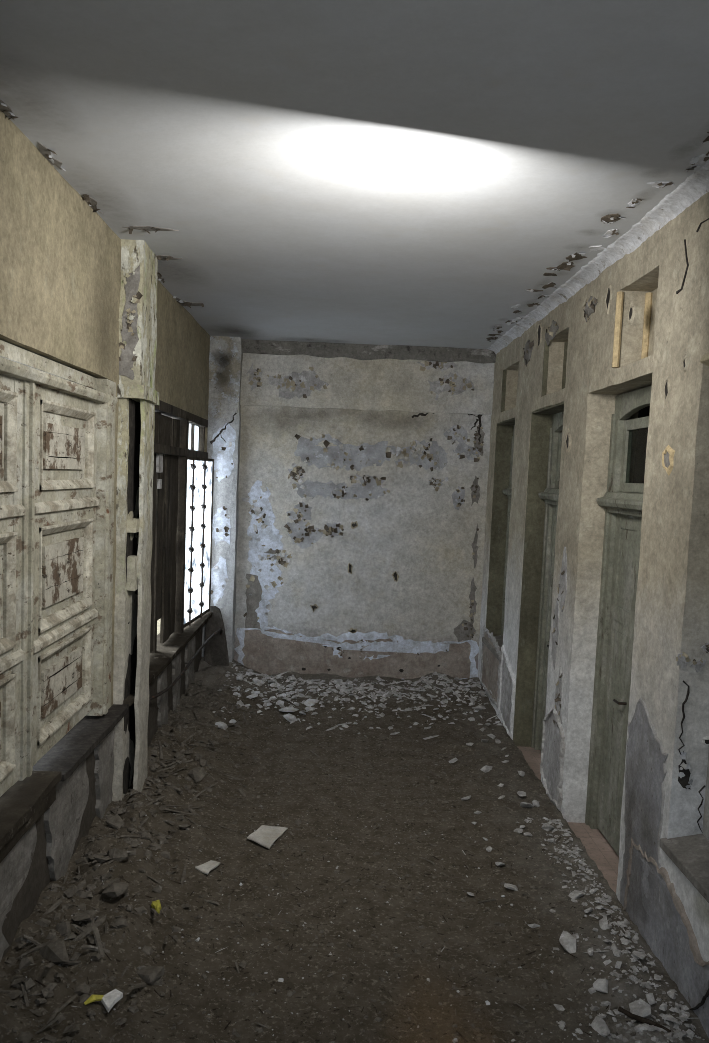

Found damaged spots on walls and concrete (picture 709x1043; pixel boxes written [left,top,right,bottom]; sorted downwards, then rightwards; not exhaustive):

peeling [486,199,642,342]
peeling [246,363,329,399]
peeling [417,361,475,400]
peeling [211,423,236,483]
peeling [211,506,231,606]
spalling [235,425,515,739]
crack [690,988,709,1010]